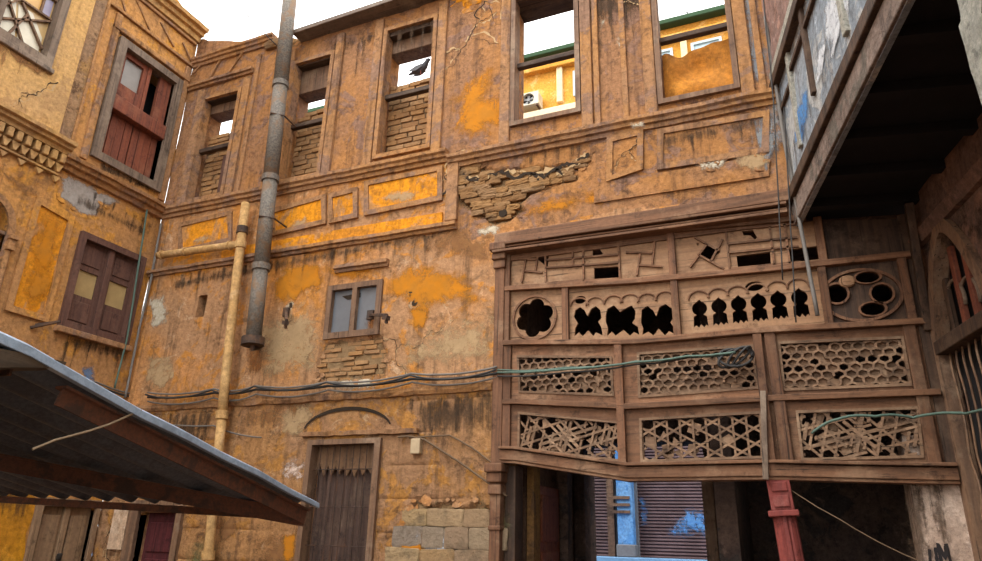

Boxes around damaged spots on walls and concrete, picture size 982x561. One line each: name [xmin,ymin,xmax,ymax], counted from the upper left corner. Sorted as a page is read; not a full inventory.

crack [445,0,502,75]
crack [10,82,58,109]
flaking render [56,172,116,218]
flaking render [458,149,594,225]
flaking render [314,339,391,385]